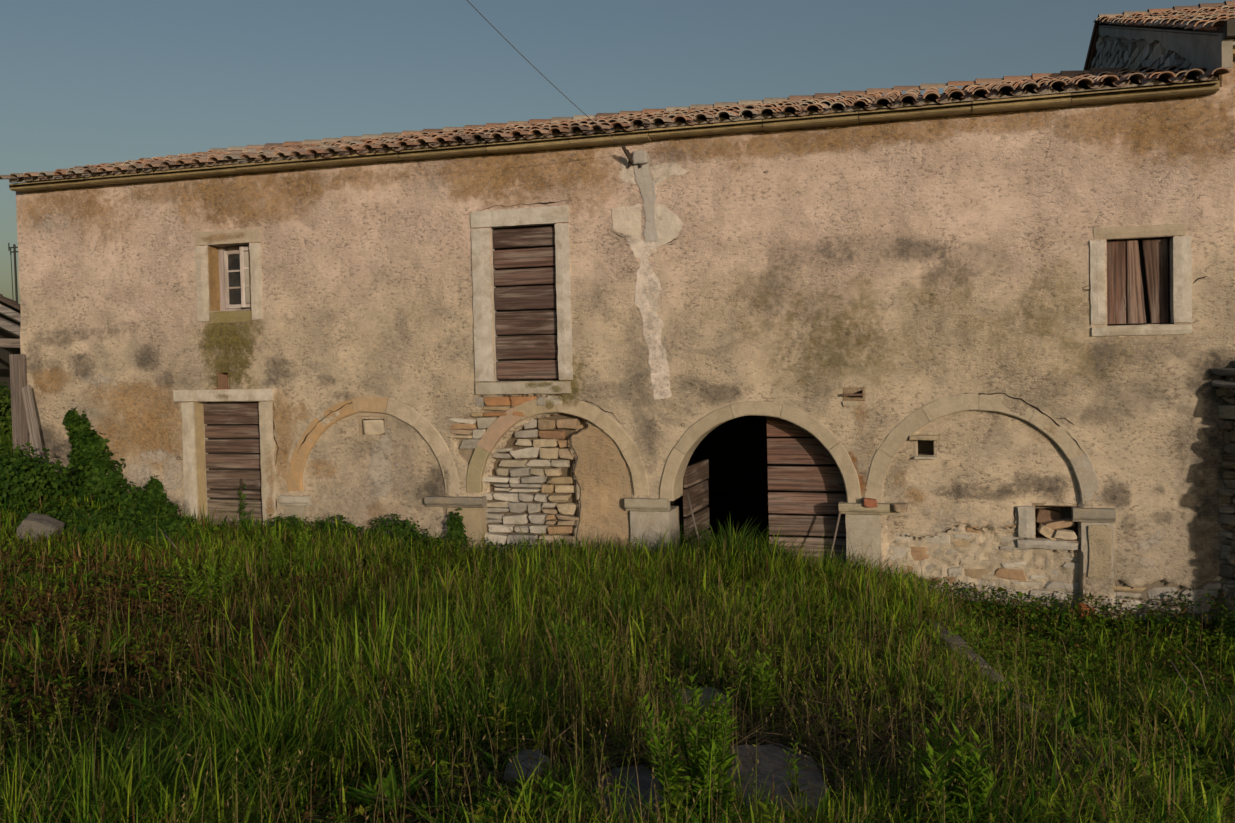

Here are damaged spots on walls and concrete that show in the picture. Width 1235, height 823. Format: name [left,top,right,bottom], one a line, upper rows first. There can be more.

peeling [612,155,687,400]
water stain [200,322,260,397]
crack [964,393,1087,457]
flaking render [887,523,1084,613]
flaking render [1103,576,1232,623]